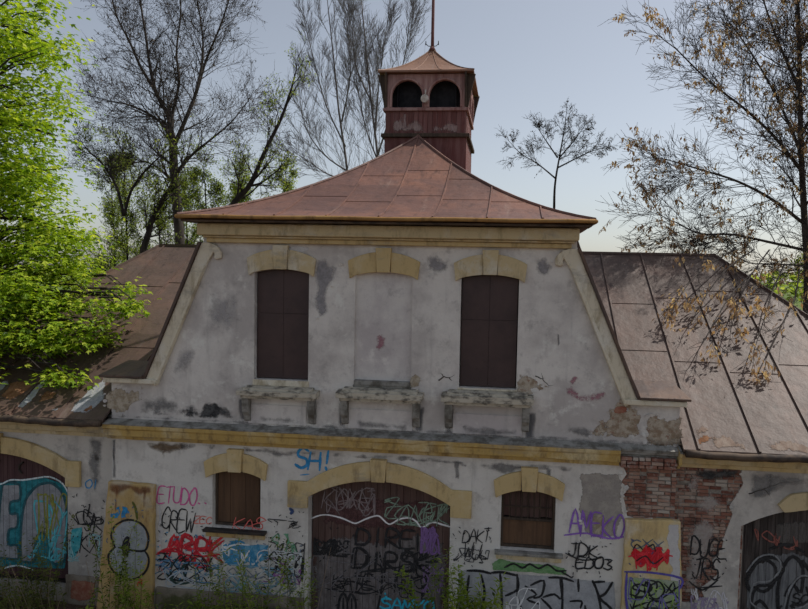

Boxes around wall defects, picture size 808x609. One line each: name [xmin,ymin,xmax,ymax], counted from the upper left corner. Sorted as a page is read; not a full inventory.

peeling [394,114,423,132]
damp [146,401,230,419]
flaking render [589,399,683,448]
flaking render [579,456,743,603]